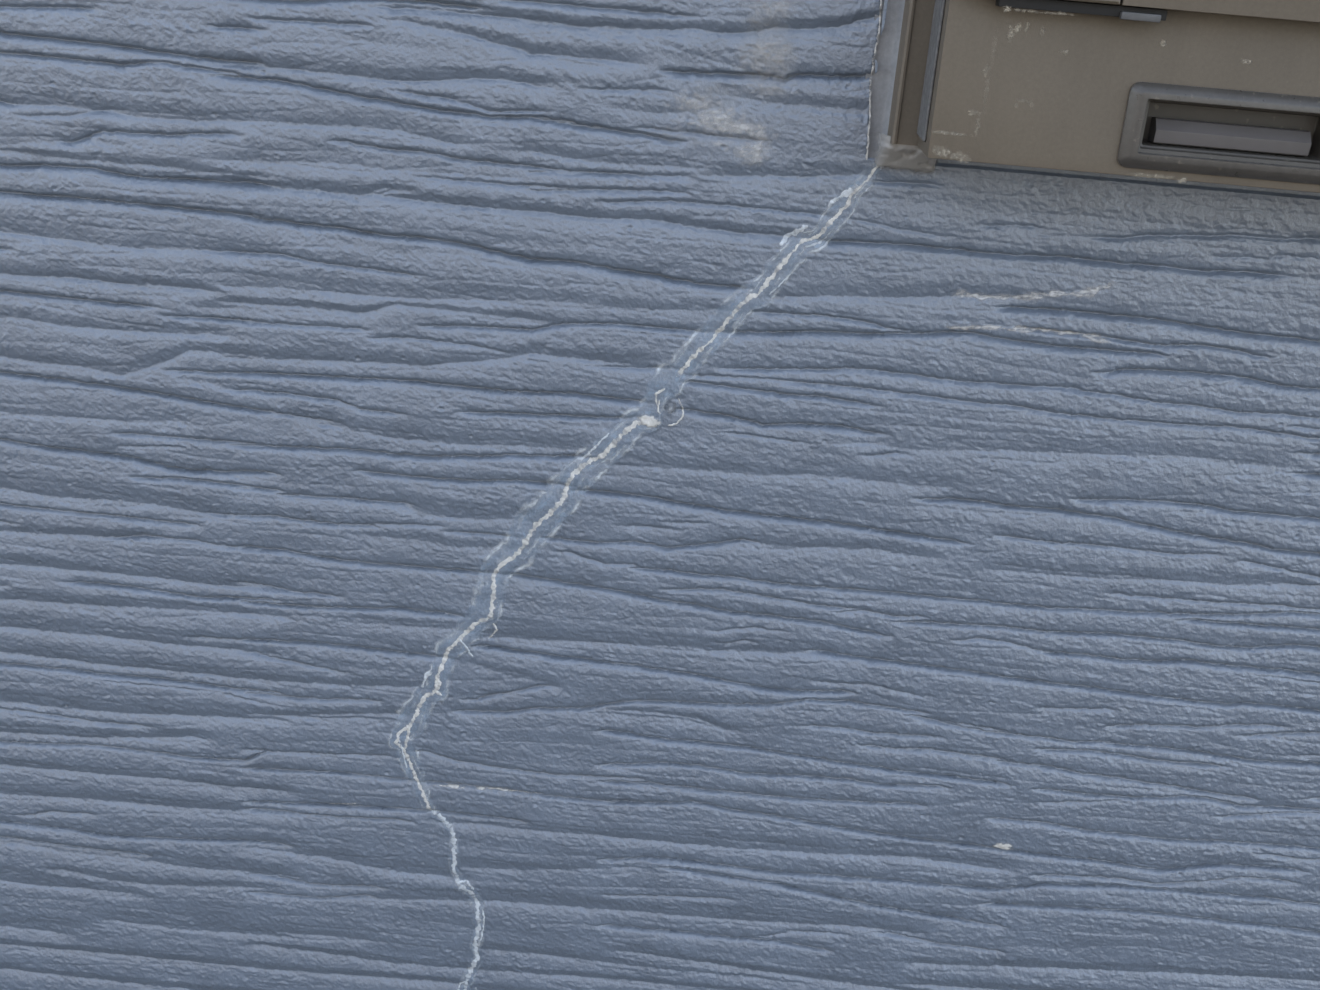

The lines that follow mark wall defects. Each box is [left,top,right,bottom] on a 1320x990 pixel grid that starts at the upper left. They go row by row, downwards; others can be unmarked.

crack [389,166,882,990]